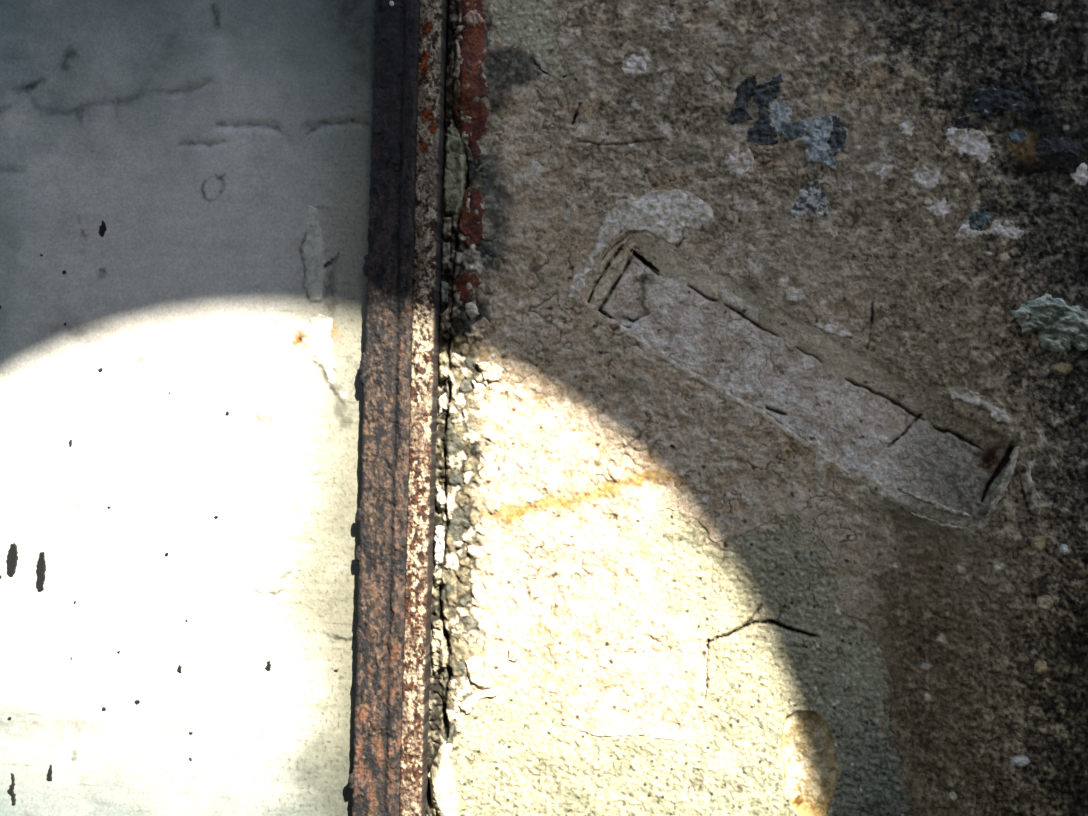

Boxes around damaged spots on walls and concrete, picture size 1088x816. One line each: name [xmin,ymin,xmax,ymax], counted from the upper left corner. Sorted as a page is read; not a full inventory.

flaking render [452,0,576,166]
peeling [726,73,847,171]
water stain [954,78,1088,176]
peeling [459,186,485,248]
peeling [790,179,833,219]
peeling [300,206,350,421]
peeling [452,270,490,340]
corrosion [359,353,367,385]
corrosion [484,470,677,522]
flaking render [445,506,916,816]
crack [706,604,817,691]